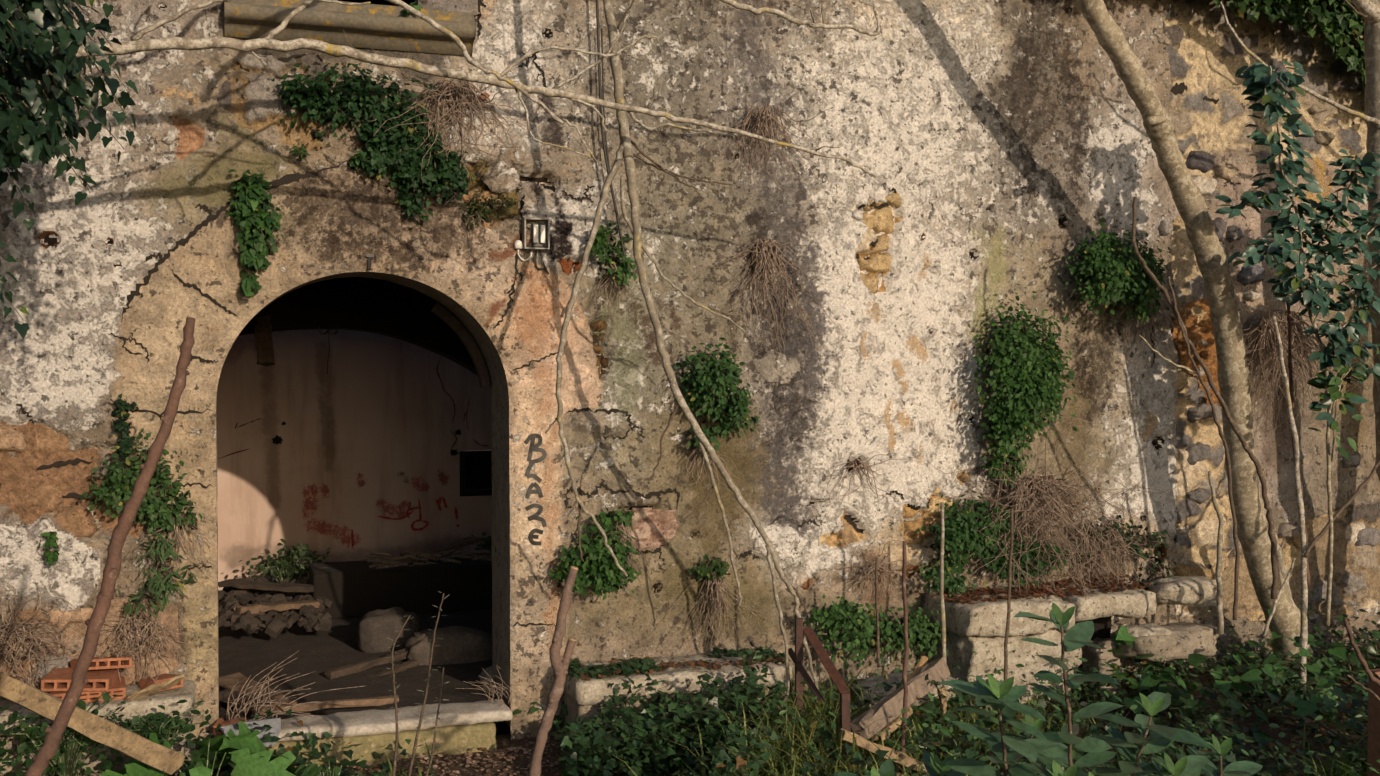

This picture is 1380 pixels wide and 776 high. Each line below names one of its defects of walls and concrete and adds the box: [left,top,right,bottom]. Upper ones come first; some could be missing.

flaking render [215,53,362,170]
flaking render [161,118,217,160]
crack [108,160,347,364]
flaking render [851,185,903,360]
crack [564,407,645,440]
flaking render [0,421,155,538]
crack [564,479,680,510]
crack [633,545,666,570]
flaking render [818,510,865,549]
flaking render [1154,536,1178,561]